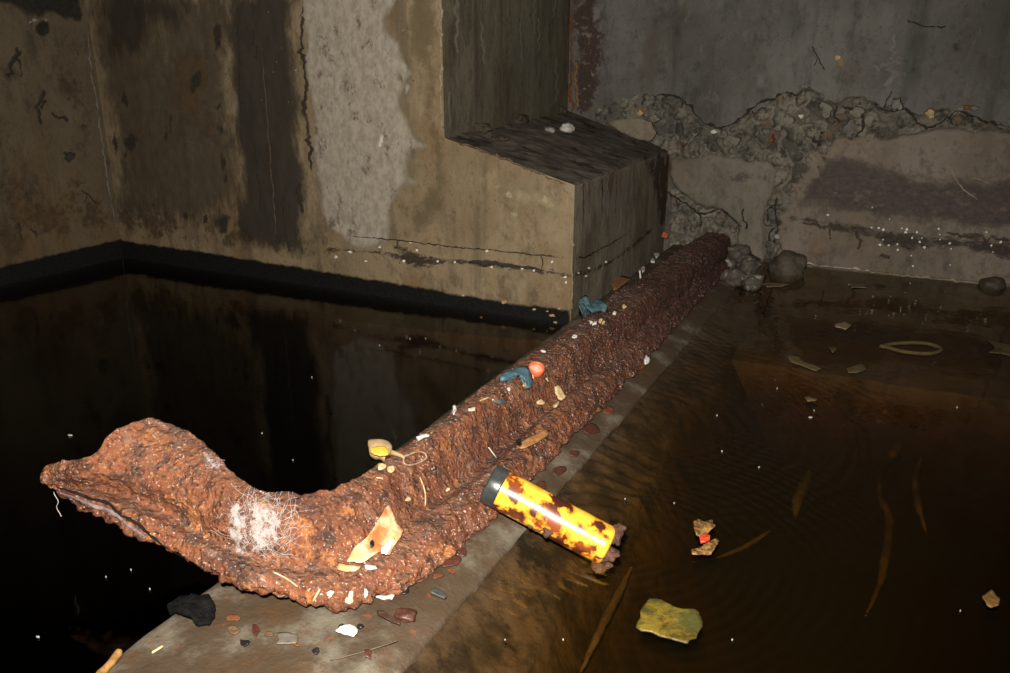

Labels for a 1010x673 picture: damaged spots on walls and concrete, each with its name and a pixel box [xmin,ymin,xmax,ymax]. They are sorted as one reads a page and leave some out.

corrosion [568,0,615,113]
water stain [0,0,570,341]
spalling [595,84,1010,262]
crack [354,234,626,269]
water stain [364,230,651,284]
spalling [639,187,738,278]
crack [668,192,779,243]
water stain [790,214,1010,284]
corrosion [535,450,580,489]
corrosion [60,493,152,542]
corrosion [401,547,467,595]